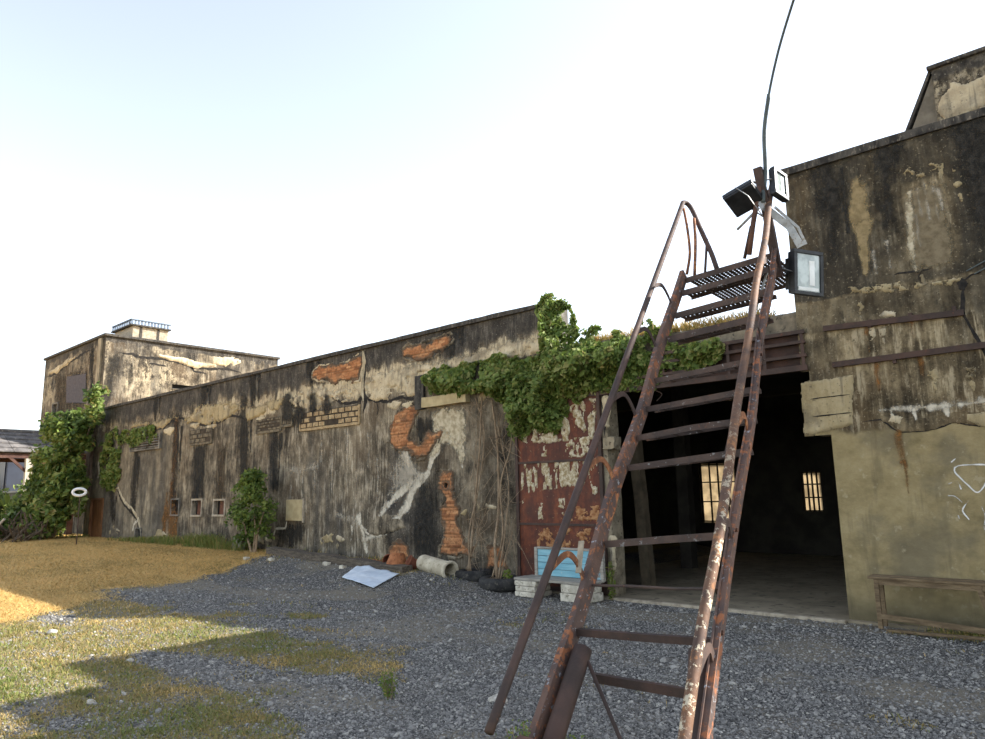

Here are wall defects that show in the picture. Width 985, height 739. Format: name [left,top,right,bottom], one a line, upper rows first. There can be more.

flaking render [937,75,985,119]
leakage [809,142,903,275]
leakage [906,182,952,270]
leakage [170,412,183,502]
leakage [190,373,261,507]
leakage [282,360,330,432]
flaking render [130,331,540,462]
leakage [340,513,387,554]
leakage [379,407,466,555]
flaking render [434,468,509,570]
peeling [521,395,621,548]
leakage [890,397,985,420]